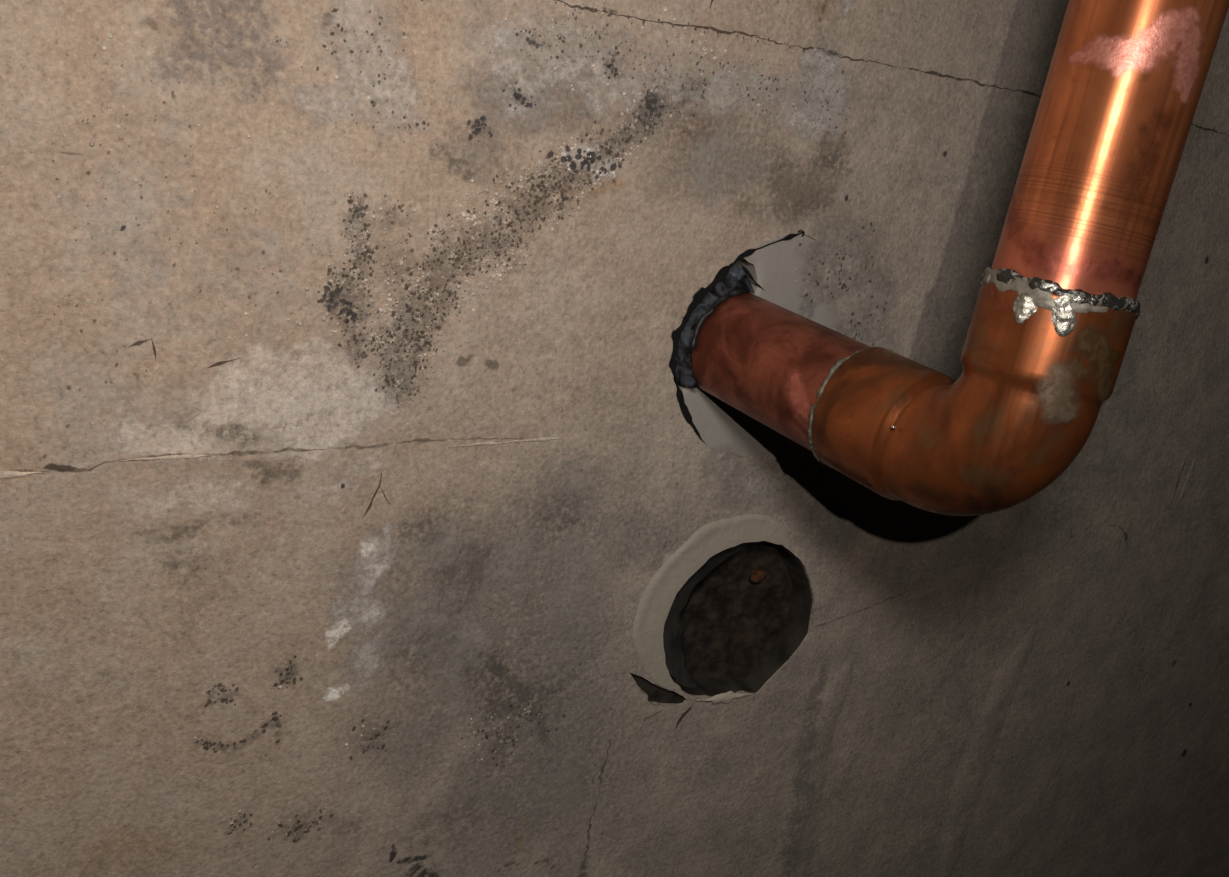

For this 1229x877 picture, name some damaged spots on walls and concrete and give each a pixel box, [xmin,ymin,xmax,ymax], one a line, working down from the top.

leakage [167,0,276,75]
leakage [294,0,420,122]
crack [555,0,1040,97]
crack [11,453,184,472]
crack [220,445,391,517]